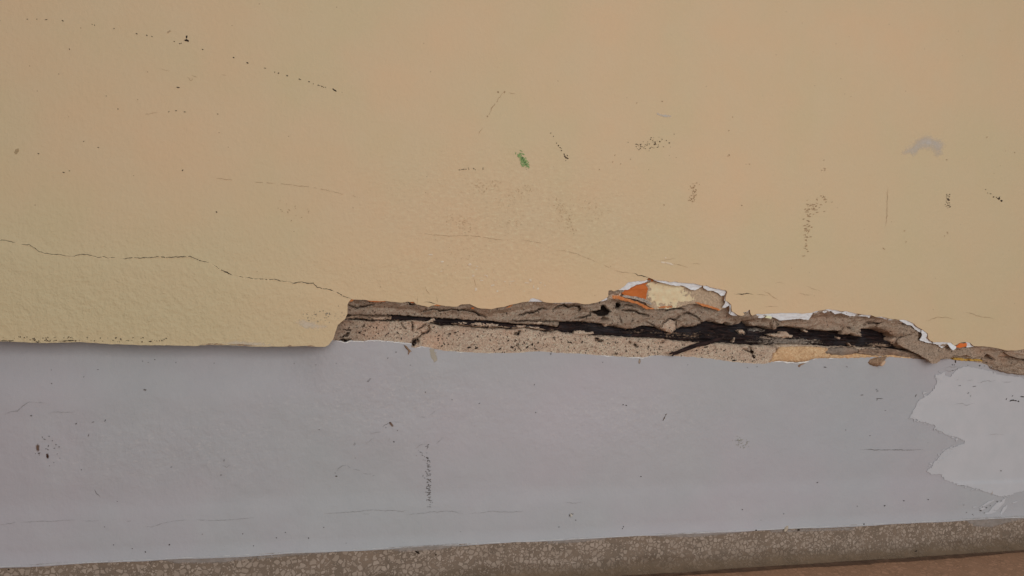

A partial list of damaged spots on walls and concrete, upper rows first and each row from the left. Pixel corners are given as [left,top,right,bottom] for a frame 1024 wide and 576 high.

crack [5,240,348,298]
spalling [301,278,1024,375]